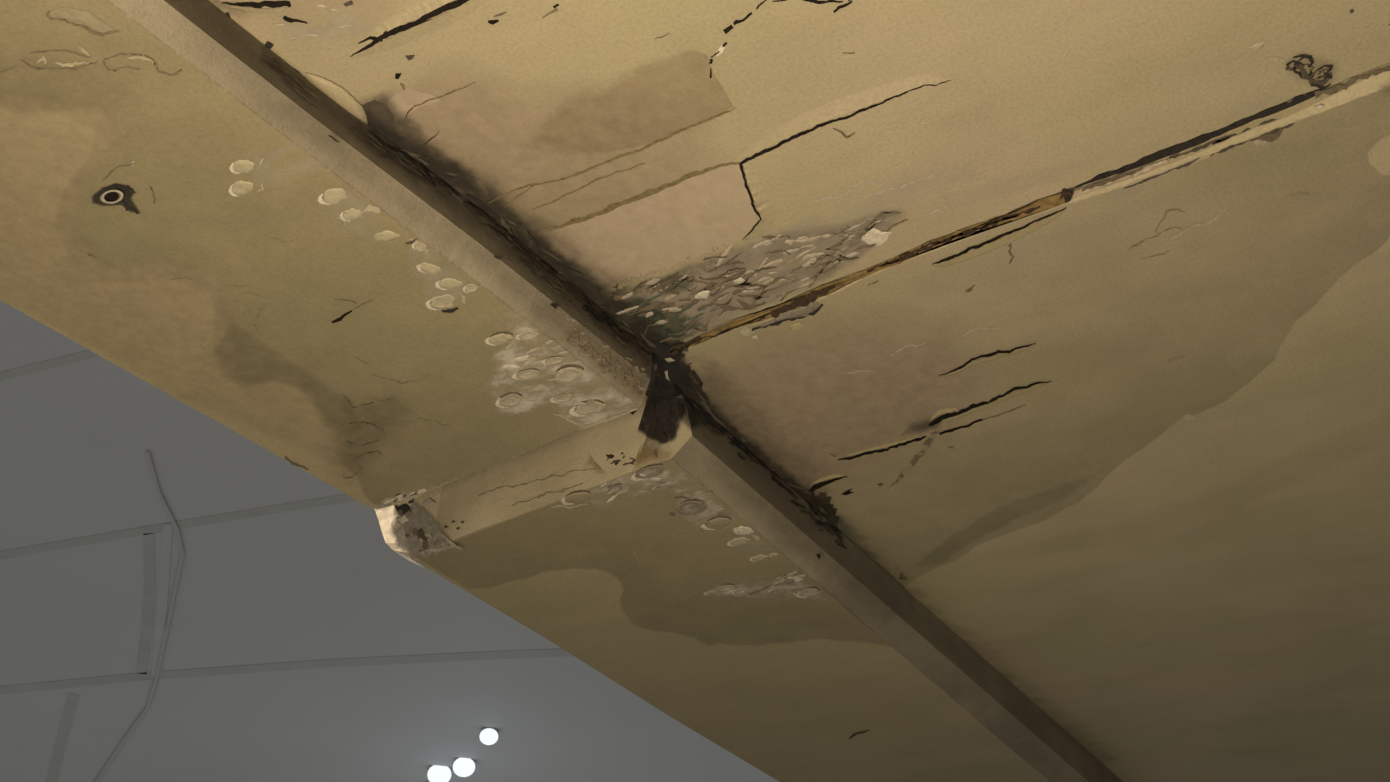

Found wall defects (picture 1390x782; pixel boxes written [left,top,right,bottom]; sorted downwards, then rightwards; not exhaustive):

crack [350,0,489,59]
crack [709,0,852,78]
damp [1248,42,1333,89]
crack [405,82,476,144]
crack [739,74,951,241]
peeling [542,162,908,345]
crack [932,207,1066,292]
damp [352,99,846,549]
crack [808,343,1052,495]
spalling [375,489,464,568]
damp [704,572,822,599]